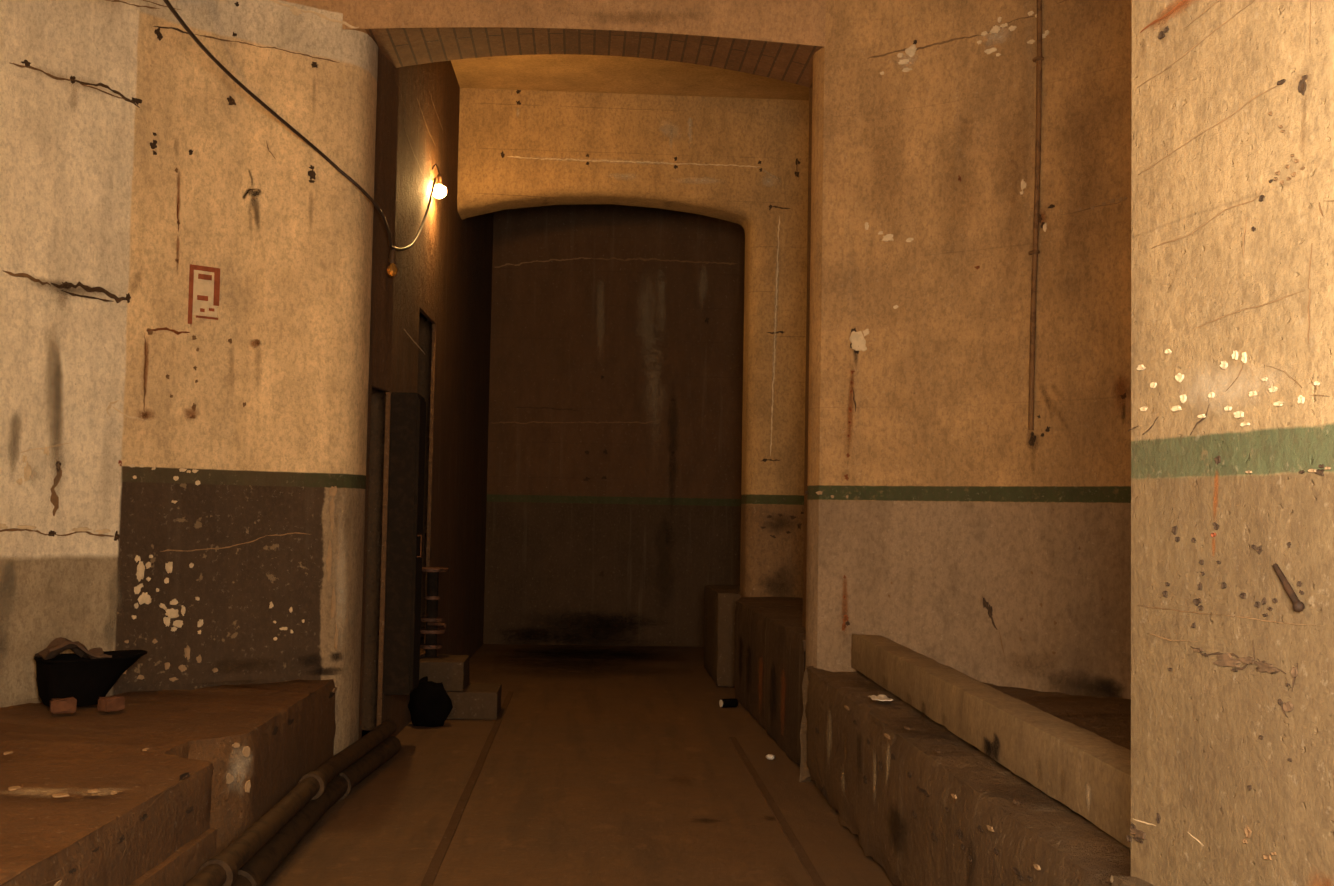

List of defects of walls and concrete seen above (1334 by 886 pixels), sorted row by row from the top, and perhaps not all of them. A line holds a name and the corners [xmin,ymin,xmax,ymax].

corrosion [1140,0,1190,33]
peeling [1220,351,1247,370]
leakage [50,346,60,461]
peeling [1171,373,1187,412]
peeling [1208,392,1250,427]
peeling [1249,377,1305,406]
crack [0,524,120,541]
peeling [132,555,218,682]